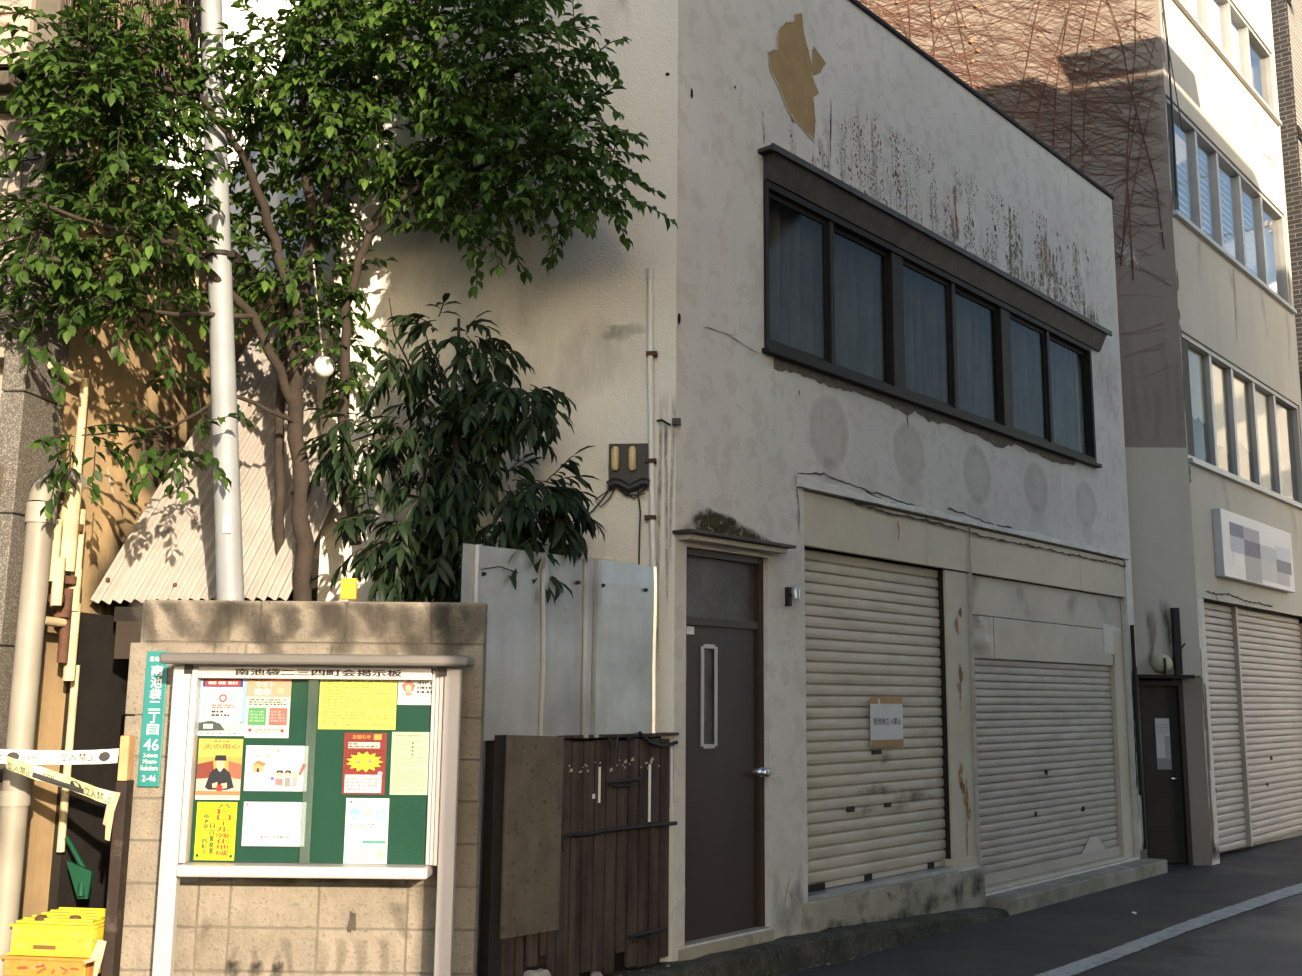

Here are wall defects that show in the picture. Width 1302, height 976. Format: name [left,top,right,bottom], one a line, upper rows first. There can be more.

peeling [768,12,1098,324]
rust [959,766,971,851]